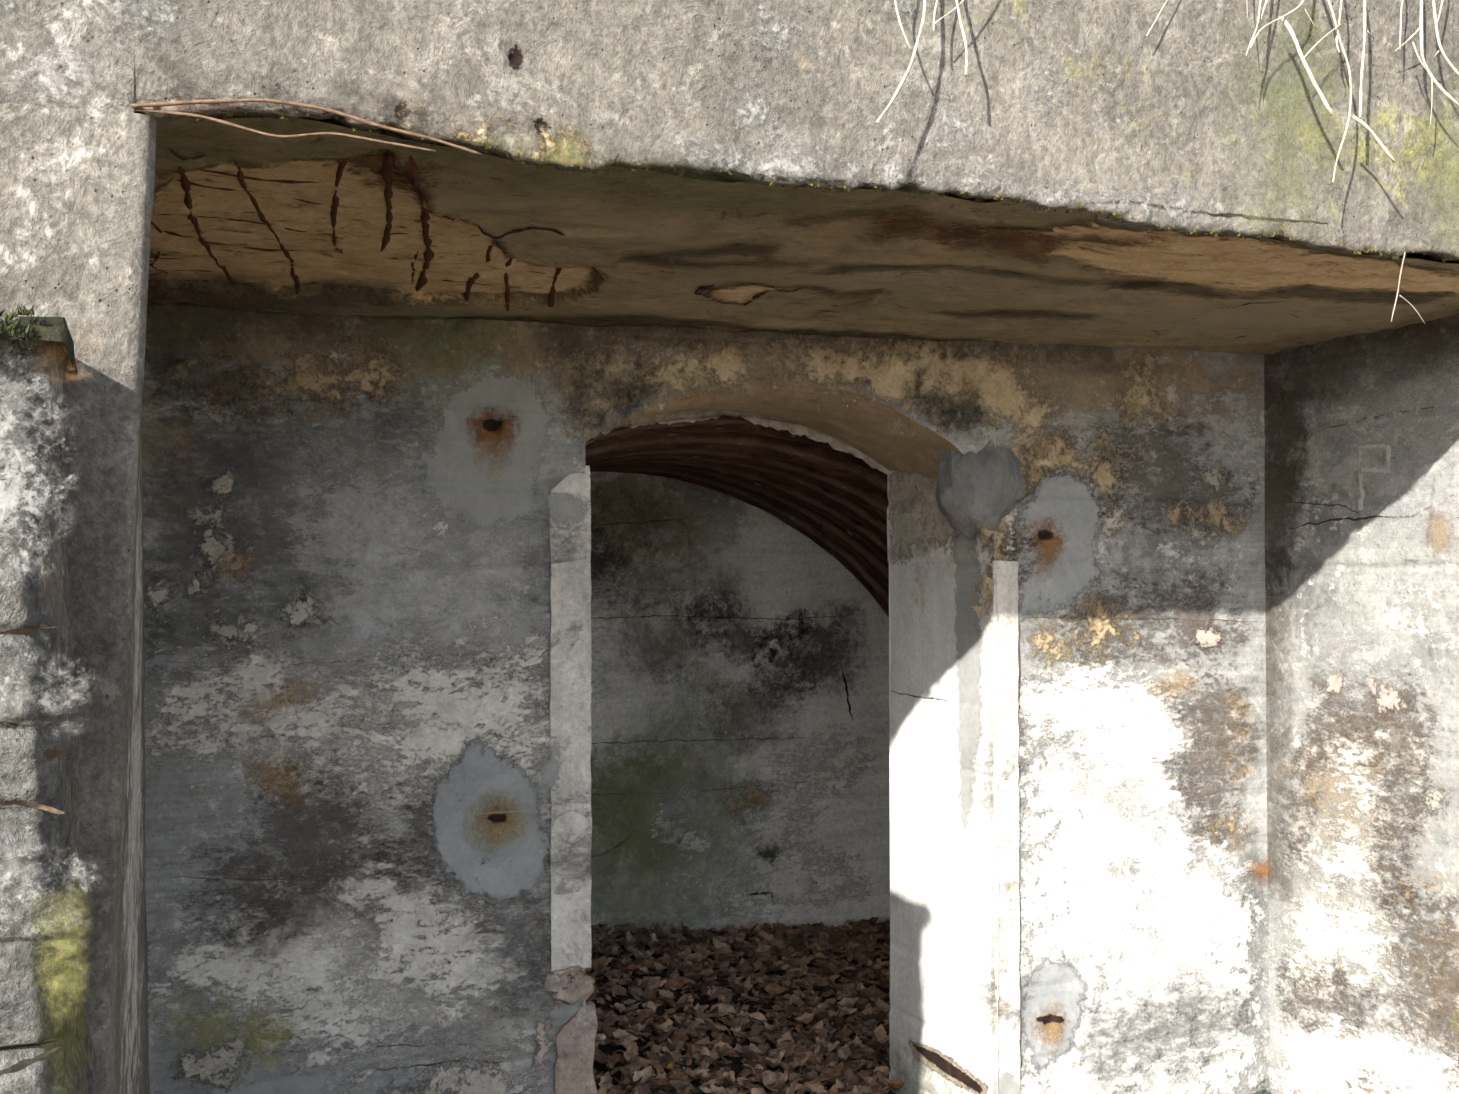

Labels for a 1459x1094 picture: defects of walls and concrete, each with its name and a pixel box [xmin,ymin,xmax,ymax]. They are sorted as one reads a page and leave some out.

spalling [116,71,607,312]
leakage [144,273,948,394]
rust [467,409,519,456]
crack [1314,403,1452,432]
leakage [144,389,429,656]
rust [1029,520,1063,568]
crack [1291,494,1459,529]
peeling [560,137,1459,1094]
leakage [1264,318,1459,897]
peeling [144,337,604,1094]
crack [0,1039,62,1075]
rust [1037,1014,1064,1040]